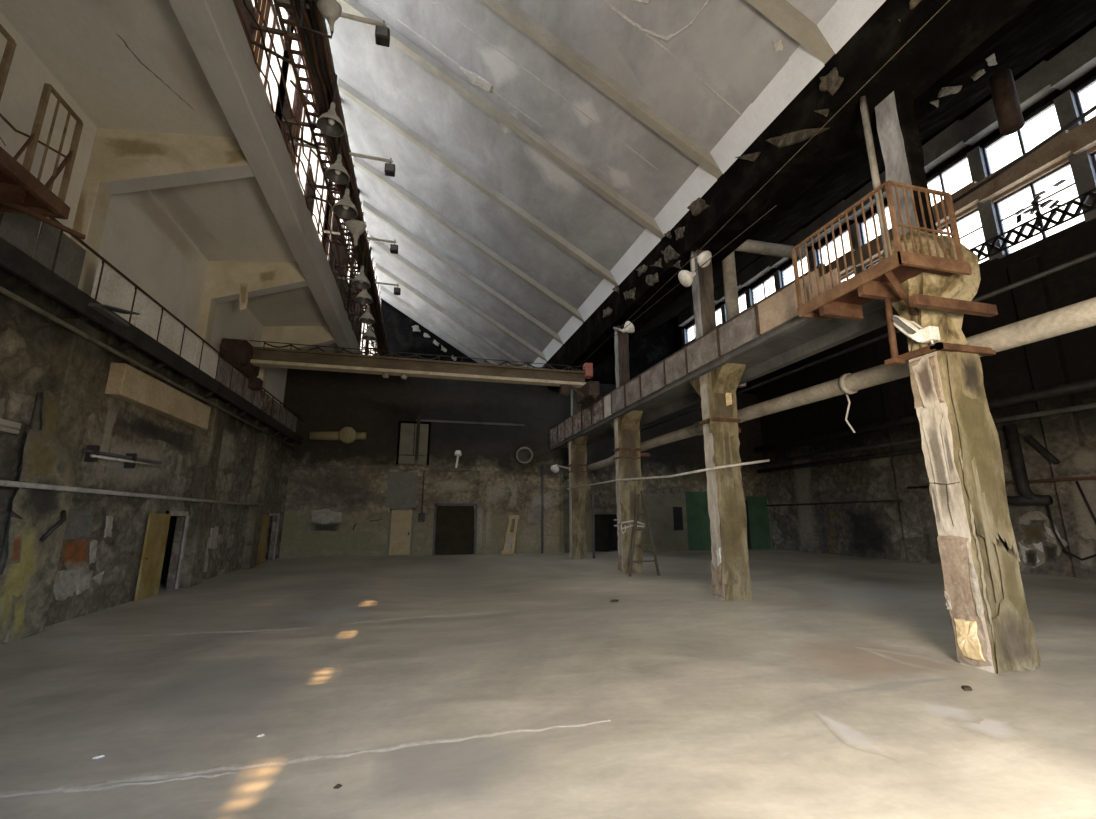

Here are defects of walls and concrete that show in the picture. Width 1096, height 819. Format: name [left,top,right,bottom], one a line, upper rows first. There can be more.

crack [118,35,194,110]
leakage [95,130,180,161]
spalling [908,354,945,408]
spalling [937,535,992,667]